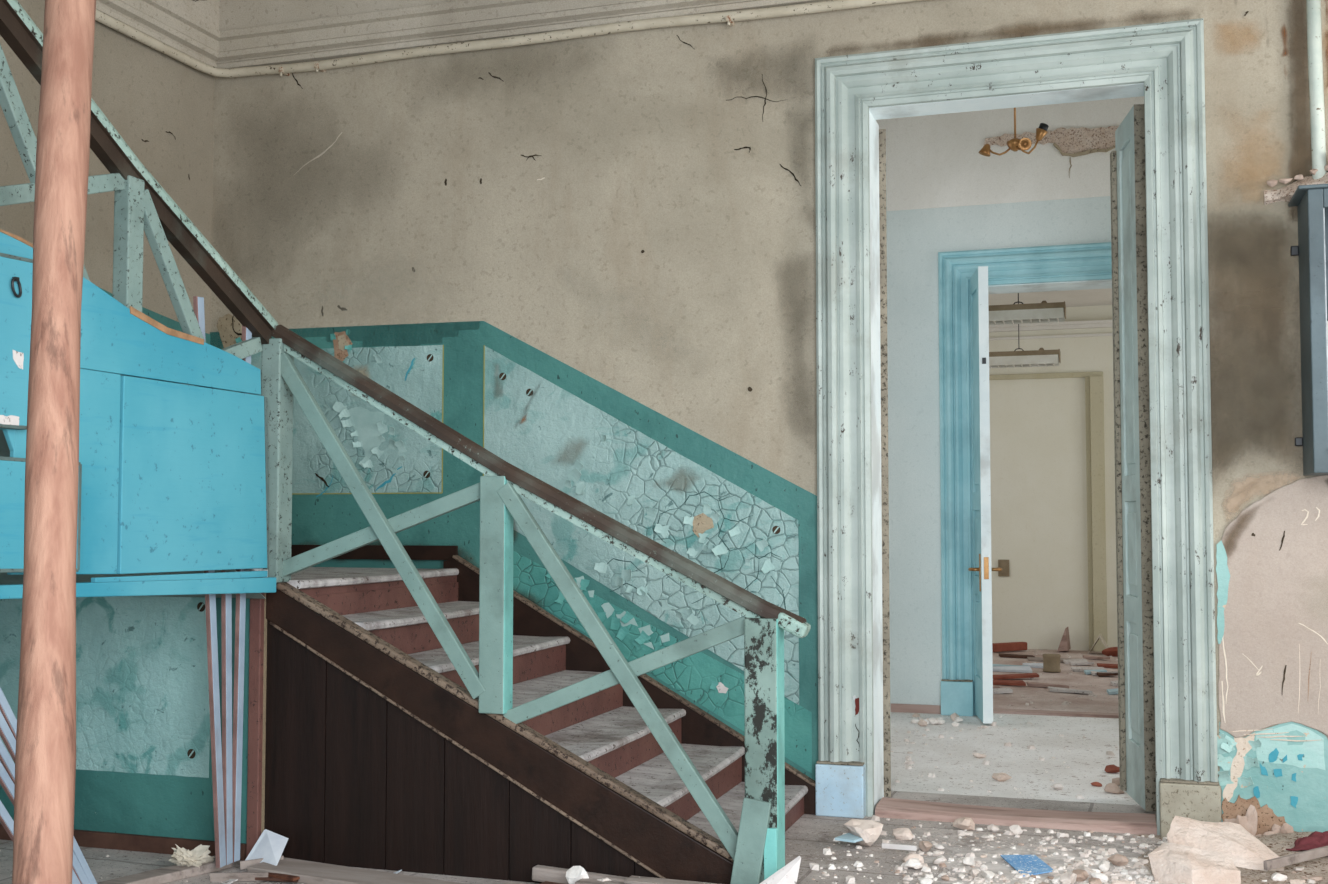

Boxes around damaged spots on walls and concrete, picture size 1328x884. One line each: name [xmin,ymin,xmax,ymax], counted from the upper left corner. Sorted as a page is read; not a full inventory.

crack [726,74,783,153]
flaking render [983,126,1119,178]
flaking render [330,329,352,362]
peeling [323,401,407,491]
peeling [574,558,706,651]
peeling [627,491,786,610]
peeling [1216,540,1230,644]
peeling [710,681,729,693]
peeling [1217,722,1328,836]